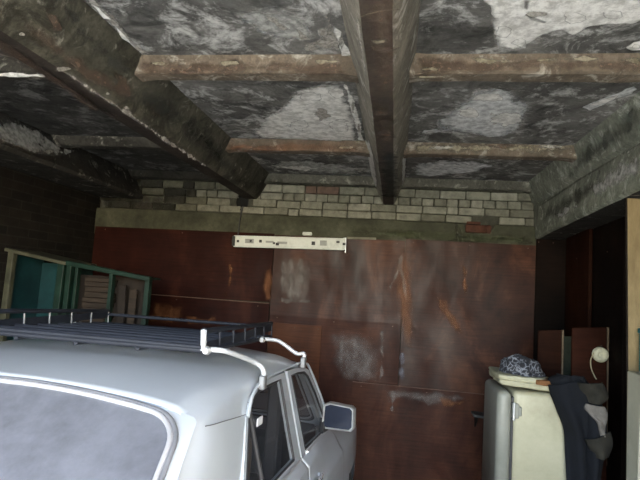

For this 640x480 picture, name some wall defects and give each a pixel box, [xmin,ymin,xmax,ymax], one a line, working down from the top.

peeling [0,123,71,154]
water stain [416,90,566,152]